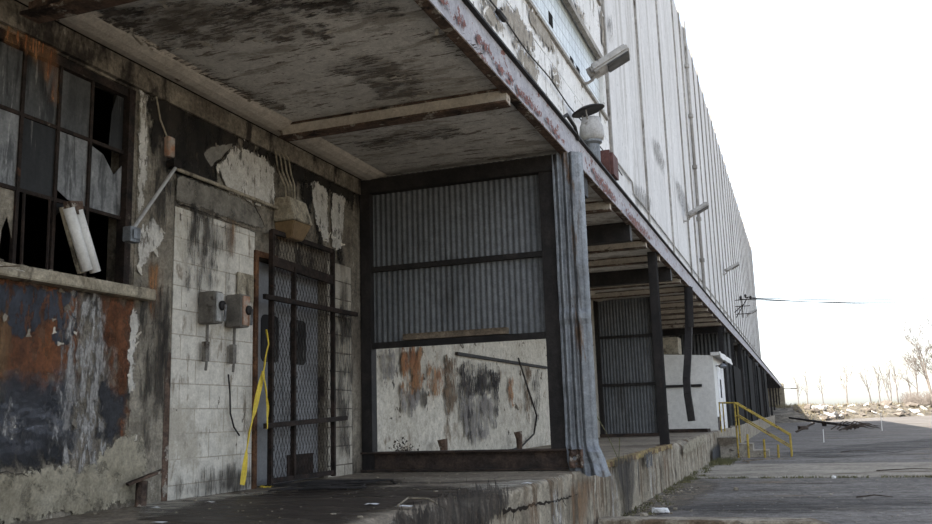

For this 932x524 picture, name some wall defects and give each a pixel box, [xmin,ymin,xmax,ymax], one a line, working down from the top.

leakage [197,0,404,41]
rust [414,0,568,153]
peeling [137,89,148,214]
peeling [176,139,276,228]
peeling [311,180,346,250]
rust [0,265,81,390]
spalling [0,372,147,524]
rust [100,296,135,437]
leakage [141,464,489,524]
leakage [457,361,501,448]
crack [503,493,578,519]
rust [583,169,781,387]